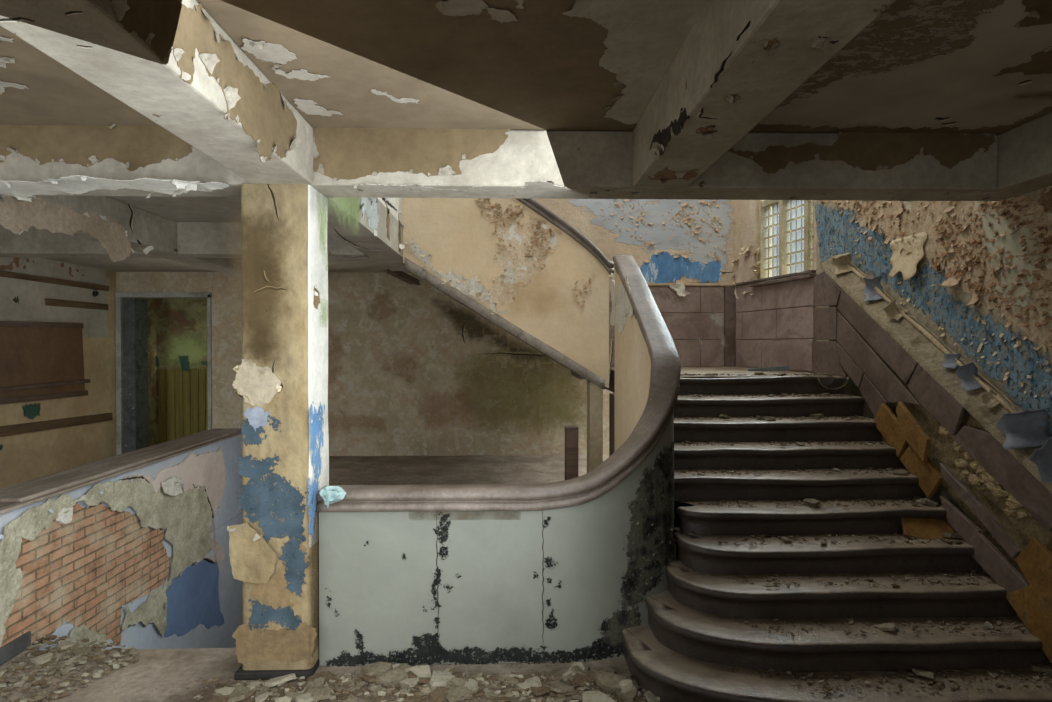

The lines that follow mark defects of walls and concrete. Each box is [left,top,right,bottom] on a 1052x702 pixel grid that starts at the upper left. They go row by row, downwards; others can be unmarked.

crack [0,16,35,24]
crack [64,9,84,17]
peeling [0,124,229,262]
peeling [110,0,760,314]
peeling [728,0,1052,174]
water stain [236,221,279,356]
peeling [813,186,1052,484]
flaking render [0,359,346,650]
water stain [311,495,339,640]
crack [433,512,441,641]
water stain [326,512,624,667]
crack [539,512,547,650]